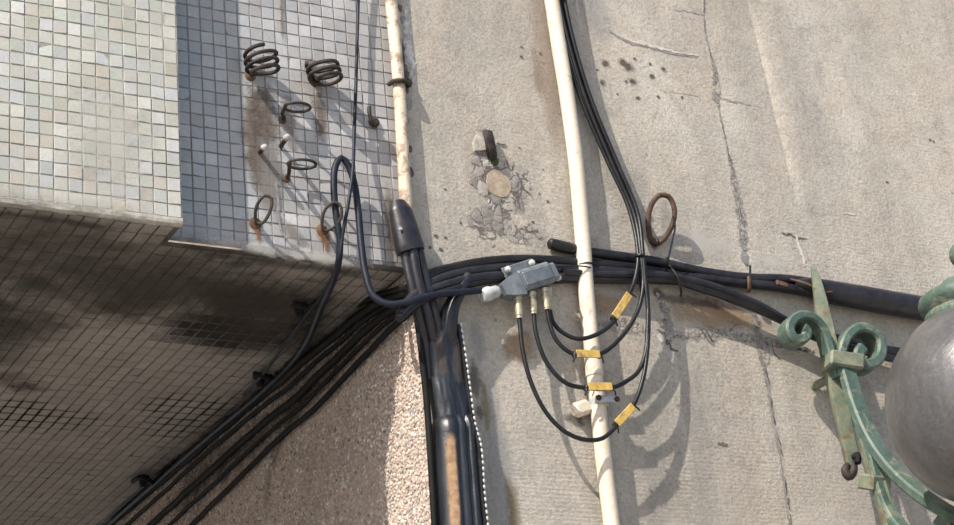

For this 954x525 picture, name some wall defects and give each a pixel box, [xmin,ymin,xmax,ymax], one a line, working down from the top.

rust [243,90,277,182]
peeling [460,152,549,247]
crack [665,0,761,267]
water stain [0,214,330,351]
crack [657,311,815,525]